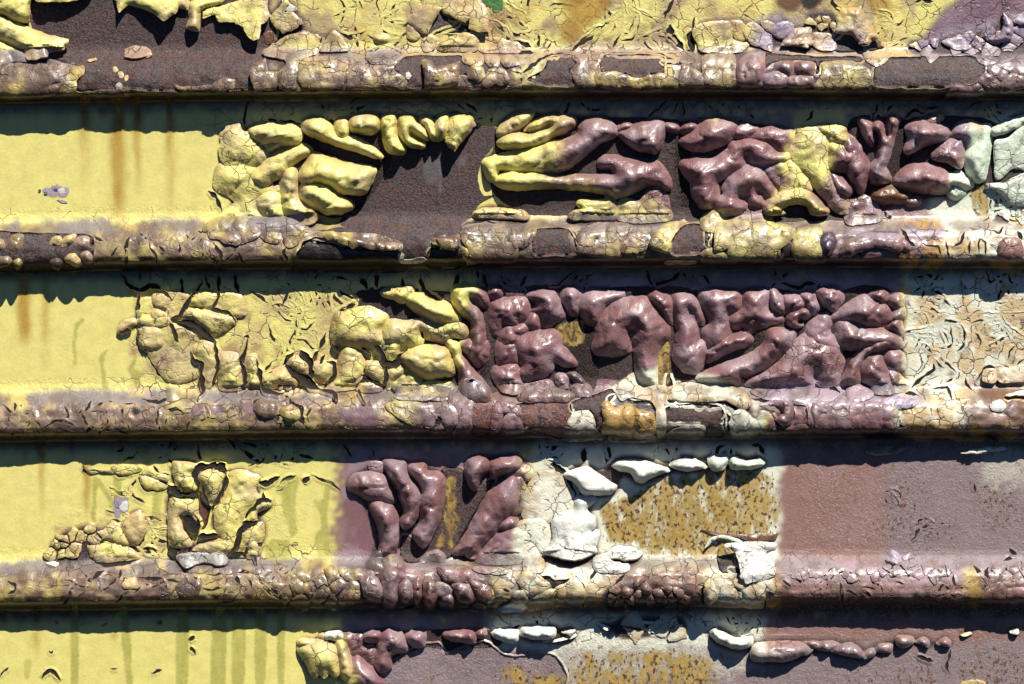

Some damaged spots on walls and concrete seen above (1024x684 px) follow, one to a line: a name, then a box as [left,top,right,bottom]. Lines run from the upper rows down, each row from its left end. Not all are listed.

peeling [0,0,1024,101]
rust [113,104,122,202]
peeling [207,126,917,276]
crack [905,188,1024,400]
peeling [271,371,920,684]
rust [600,467,780,560]
peeling [841,558,953,585]
crack [781,547,1018,604]
peeling [909,514,953,543]